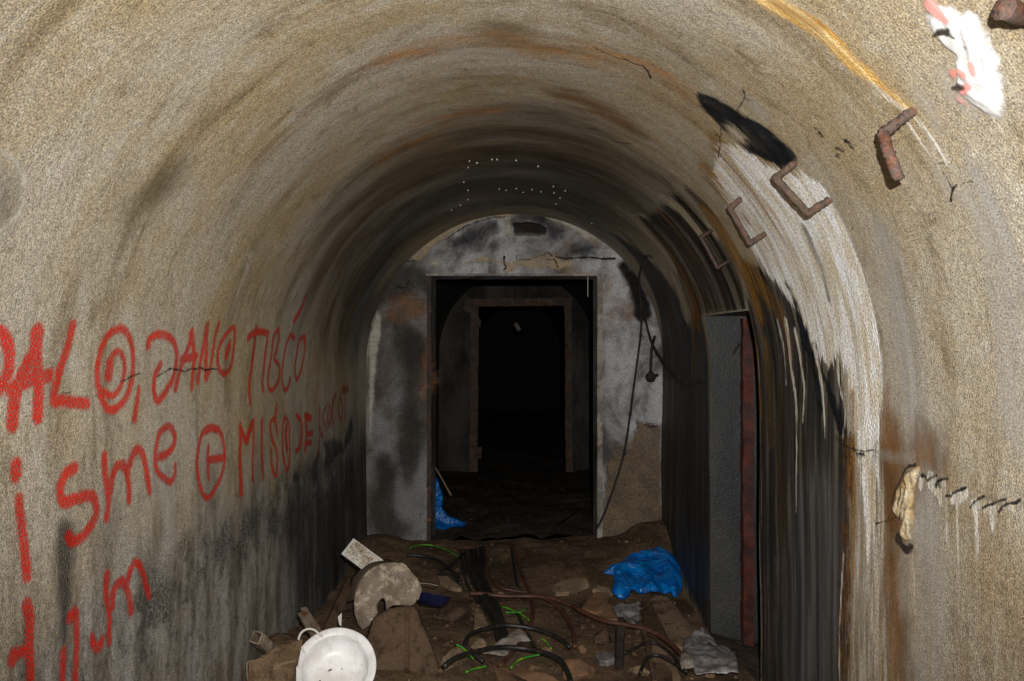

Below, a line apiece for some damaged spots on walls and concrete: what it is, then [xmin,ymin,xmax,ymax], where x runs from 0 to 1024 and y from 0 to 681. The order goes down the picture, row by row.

rust [755,0,948,169]
crack [503,253,616,270]
crack [122,367,217,381]
leakage [628,138,929,681]
leakage [181,418,367,607]
crack [919,471,1021,567]